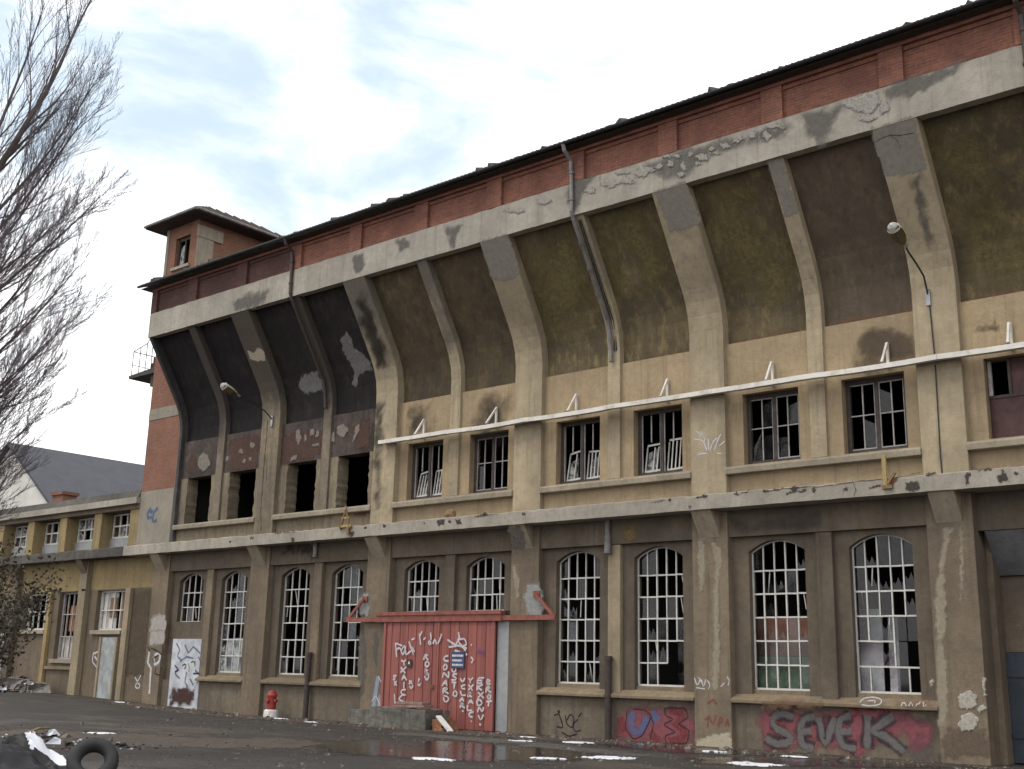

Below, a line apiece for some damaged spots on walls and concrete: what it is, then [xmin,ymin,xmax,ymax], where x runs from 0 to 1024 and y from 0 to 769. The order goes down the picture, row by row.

peeling [843,62,959,122]
damp [805,108,839,145]
peeling [584,122,786,194]
damp [913,176,931,240]
flaking render [298,371,323,395]
flaking render [340,333,373,388]
damp [858,329,913,366]
flaking render [189,452,210,473]
flaking render [226,435,259,471]
flaking render [281,420,370,465]
spalling [941,676,990,759]